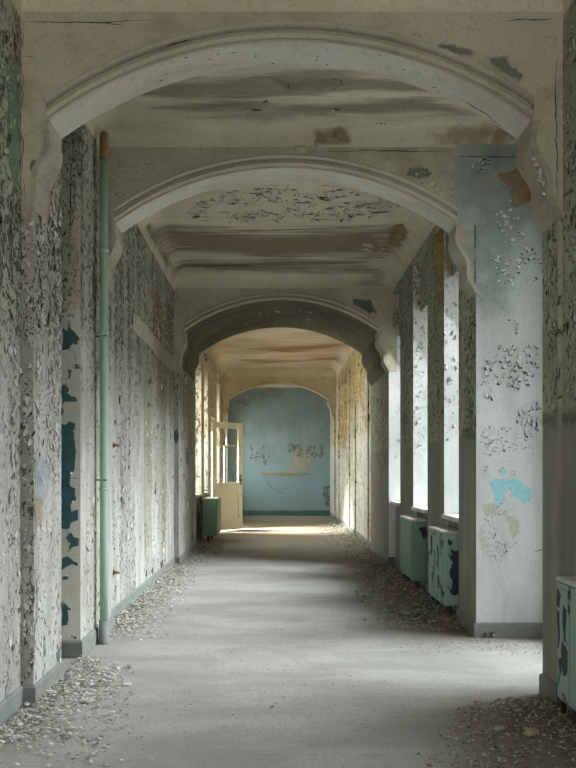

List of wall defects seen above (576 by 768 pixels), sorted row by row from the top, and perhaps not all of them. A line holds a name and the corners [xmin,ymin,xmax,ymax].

crack [52,19,149,27]
leakage [316,128,350,145]
spalling [187,185,399,223]
peeling [392,95,576,562]
peeling [0,16,100,694]
peeling [286,443,324,473]